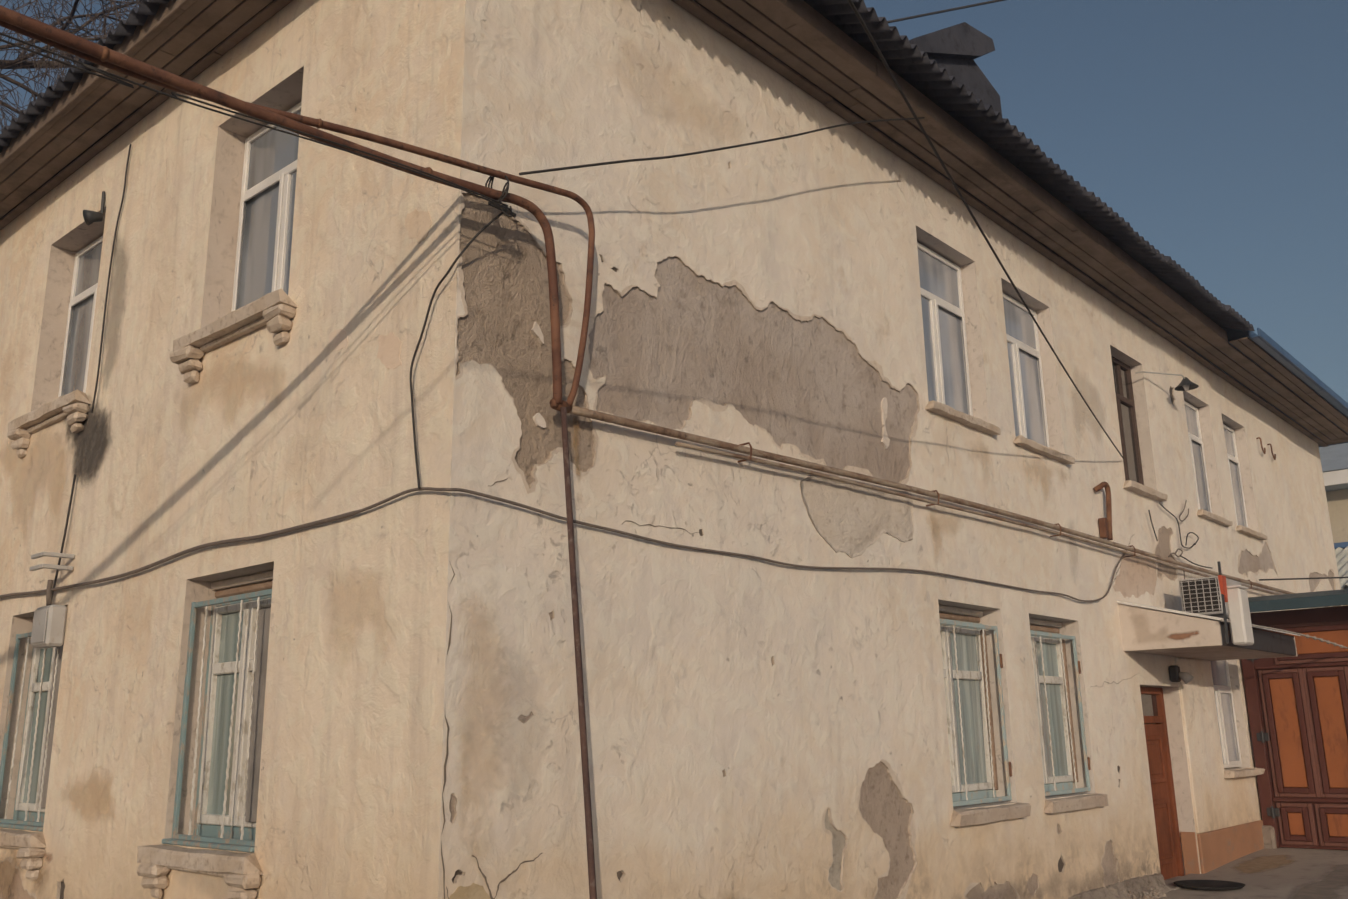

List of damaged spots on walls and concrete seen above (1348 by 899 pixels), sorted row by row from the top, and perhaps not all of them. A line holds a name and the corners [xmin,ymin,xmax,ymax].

flaking render [455,190,920,494]
flaking render [1237,540,1278,578]
crack [446,563,455,661]
flaking render [56,878,65,899]
peeling [449,870,491,899]
crack [441,716,543,899]
flaking render [822,807,848,893]
flaking render [857,759,917,899]